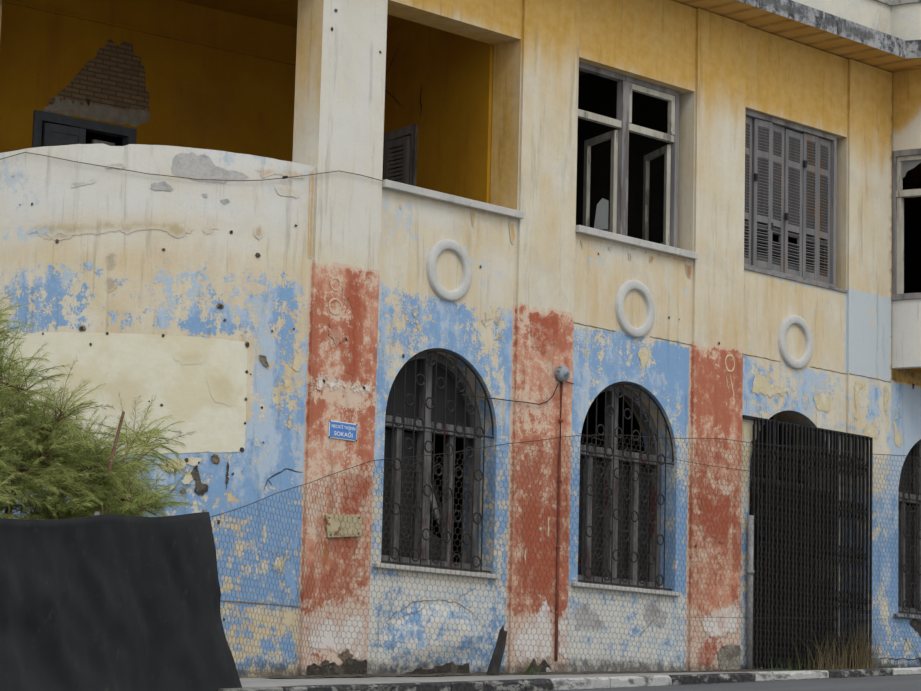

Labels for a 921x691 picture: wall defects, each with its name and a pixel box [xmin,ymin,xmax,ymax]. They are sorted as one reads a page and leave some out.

damp [756,0,807,17]
damp [818,8,887,42]
flaking render [44,39,151,127]
crack [385,41,422,116]
peeling [150,152,250,191]
peeling [638,348,651,367]
peeling [725,354,735,405]
peeling [160,454,243,496]
spalling [903,619,921,651]